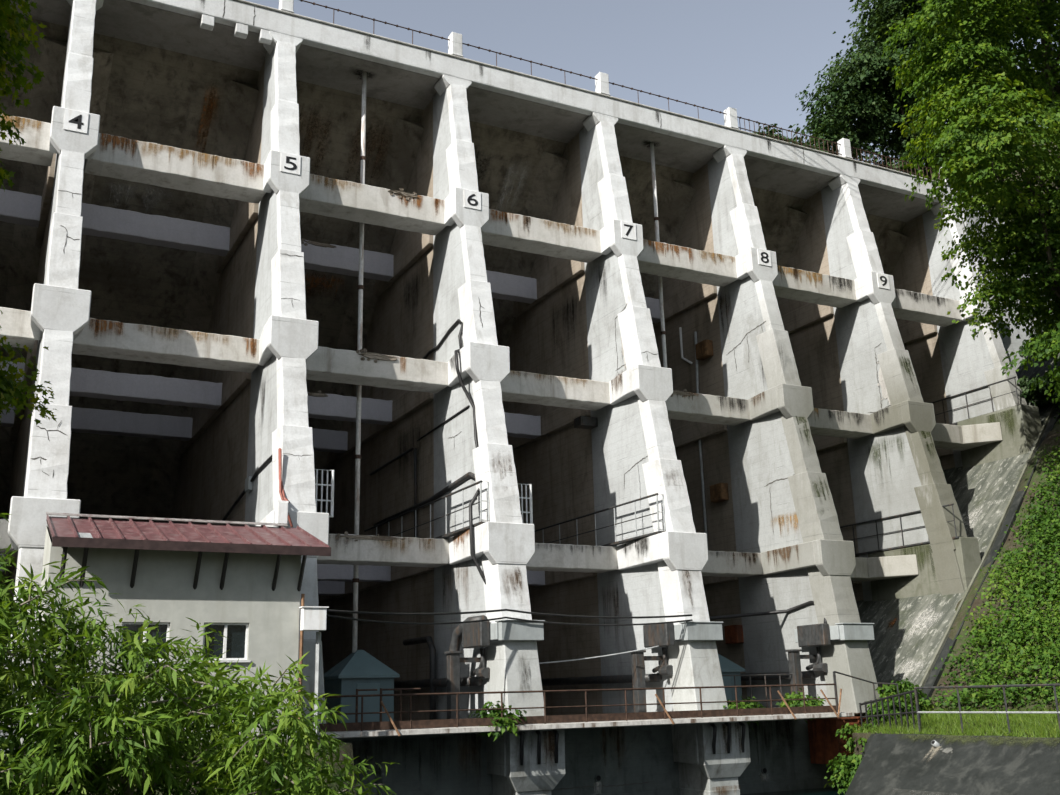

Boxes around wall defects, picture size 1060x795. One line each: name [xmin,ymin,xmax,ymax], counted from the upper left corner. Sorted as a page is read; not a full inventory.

rust [100,133,261,176]
rust [491,210,530,231]
rust [643,239,724,261]
rust [778,265,822,281]
rust [92,319,122,335]
crack [727,322,764,371]
crack [31,420,68,476]